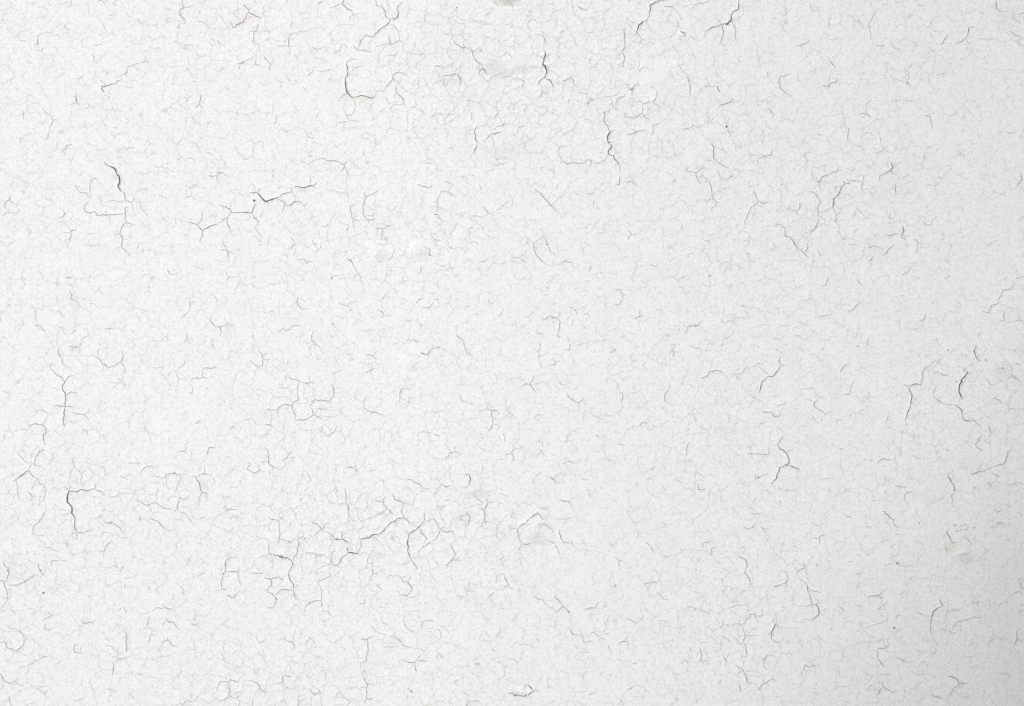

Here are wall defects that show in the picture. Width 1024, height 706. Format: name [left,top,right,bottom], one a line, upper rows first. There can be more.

crack [0,0,741,706]
crack [533,304,1024,704]
crack [683,3,938,345]
crack [846,0,1024,129]
crack [982,275,1024,322]